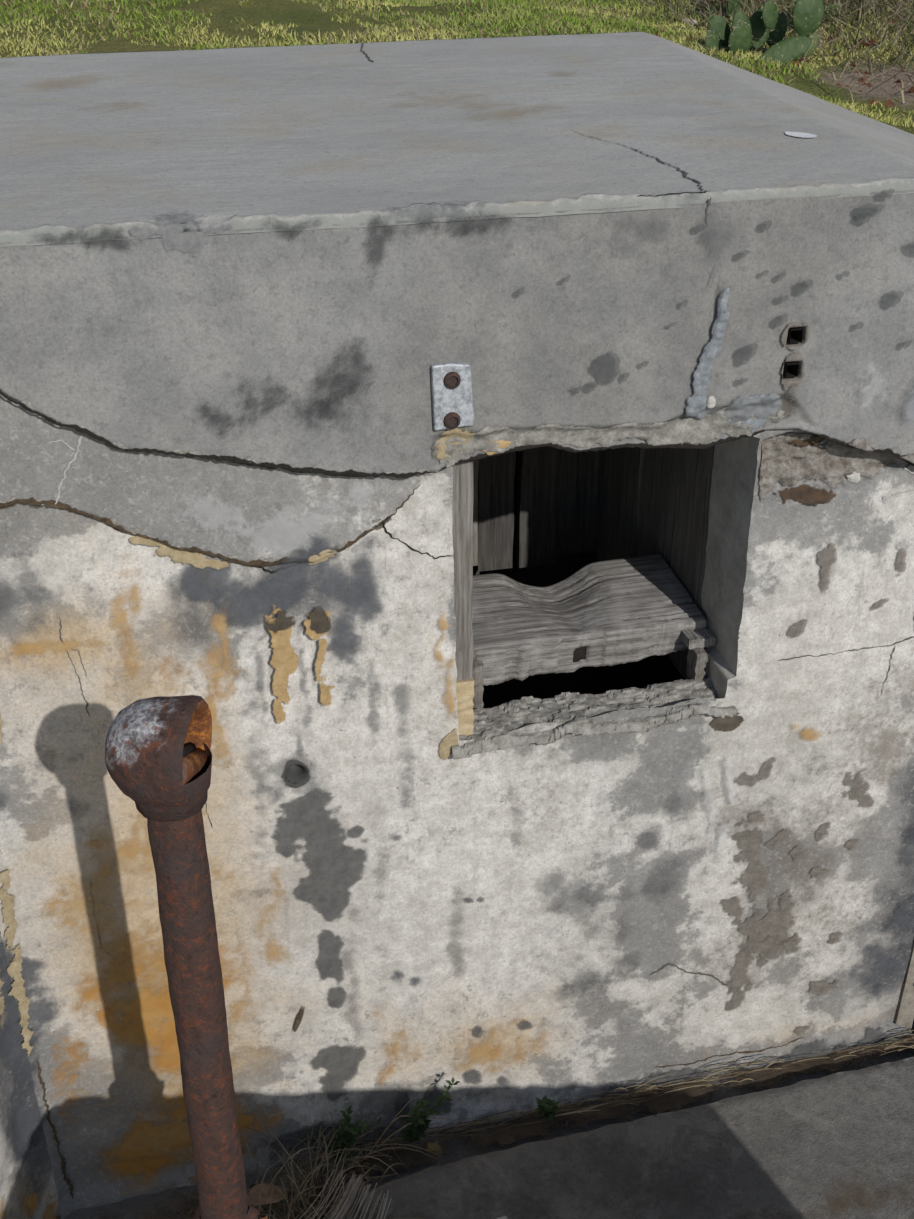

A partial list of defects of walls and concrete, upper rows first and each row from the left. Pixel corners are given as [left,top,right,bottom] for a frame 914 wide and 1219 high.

crack [575,131,711,224]
crack [0,391,766,574]
spalling [432,394,914,507]
crack [813,434,914,500]
damp [179,537,383,655]
corrosion [208,615,232,757]
spalling [439,728,458,760]
damp [274,789,368,1009]
corrosion [50,839,181,1073]
damp [294,1007,305,1032]
damp [313,1040,366,1101]
corrosion [102,1093,193,1183]